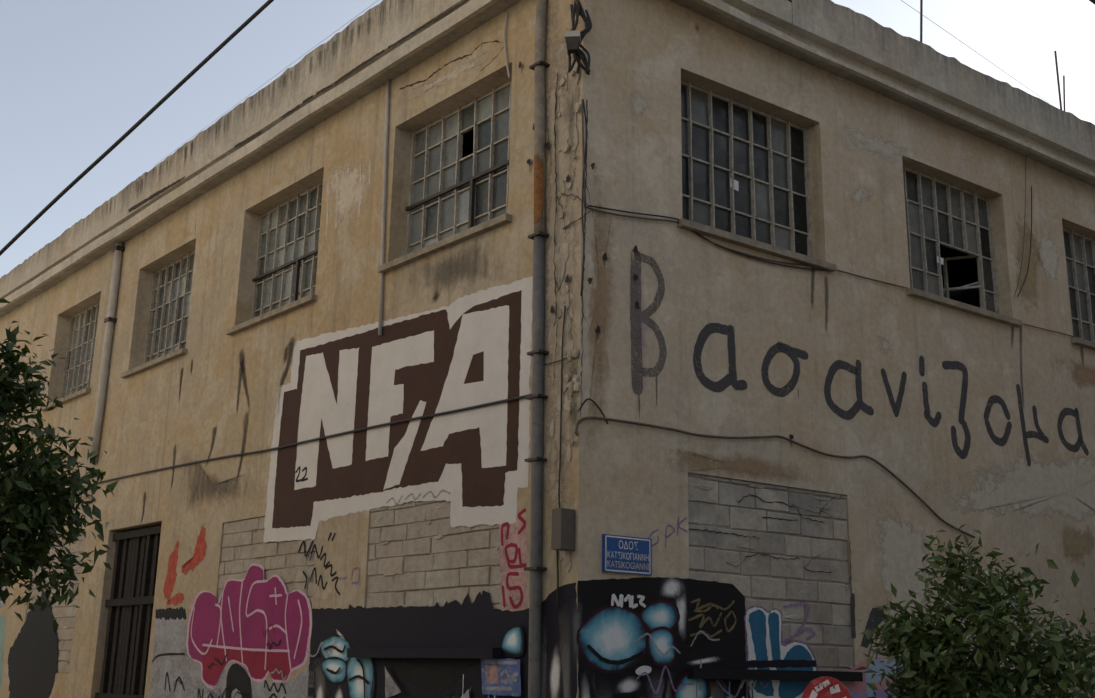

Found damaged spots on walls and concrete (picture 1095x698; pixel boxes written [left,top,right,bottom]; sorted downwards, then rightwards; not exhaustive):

corrosion [530,146,550,223]